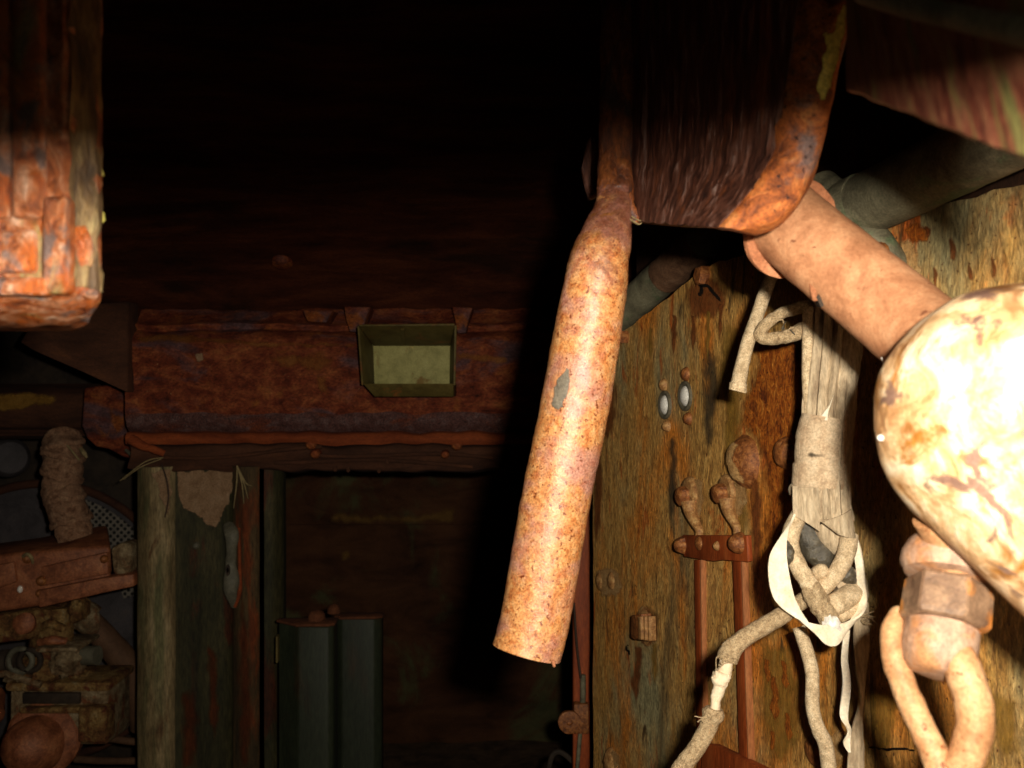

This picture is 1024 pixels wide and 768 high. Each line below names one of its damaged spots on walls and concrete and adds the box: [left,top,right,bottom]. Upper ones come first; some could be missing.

rust [604,385,617,438]
rust [689,278,802,593]
peeling [151,469,233,527]
rust [594,461,602,539]
rust [632,629,657,697]